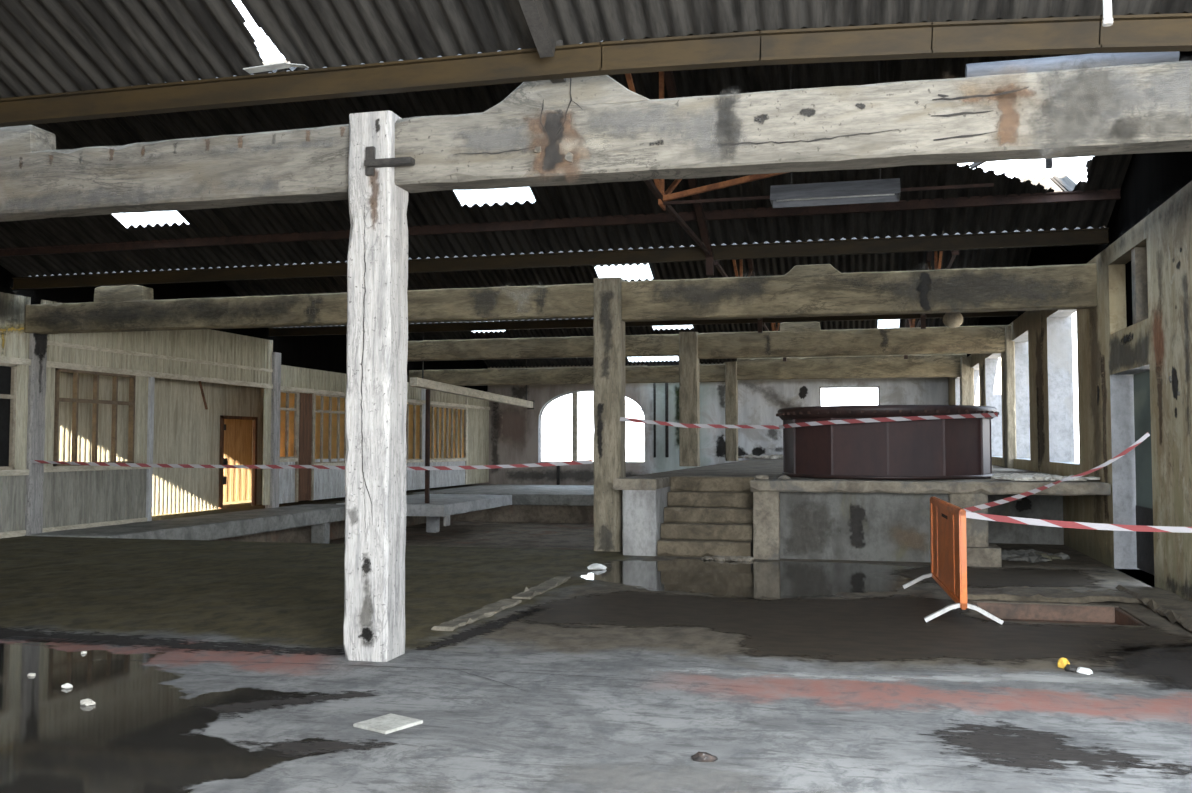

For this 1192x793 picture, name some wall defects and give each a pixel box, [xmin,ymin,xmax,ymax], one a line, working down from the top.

rust [967,85,1033,143]
damp [922,719,1192,781]